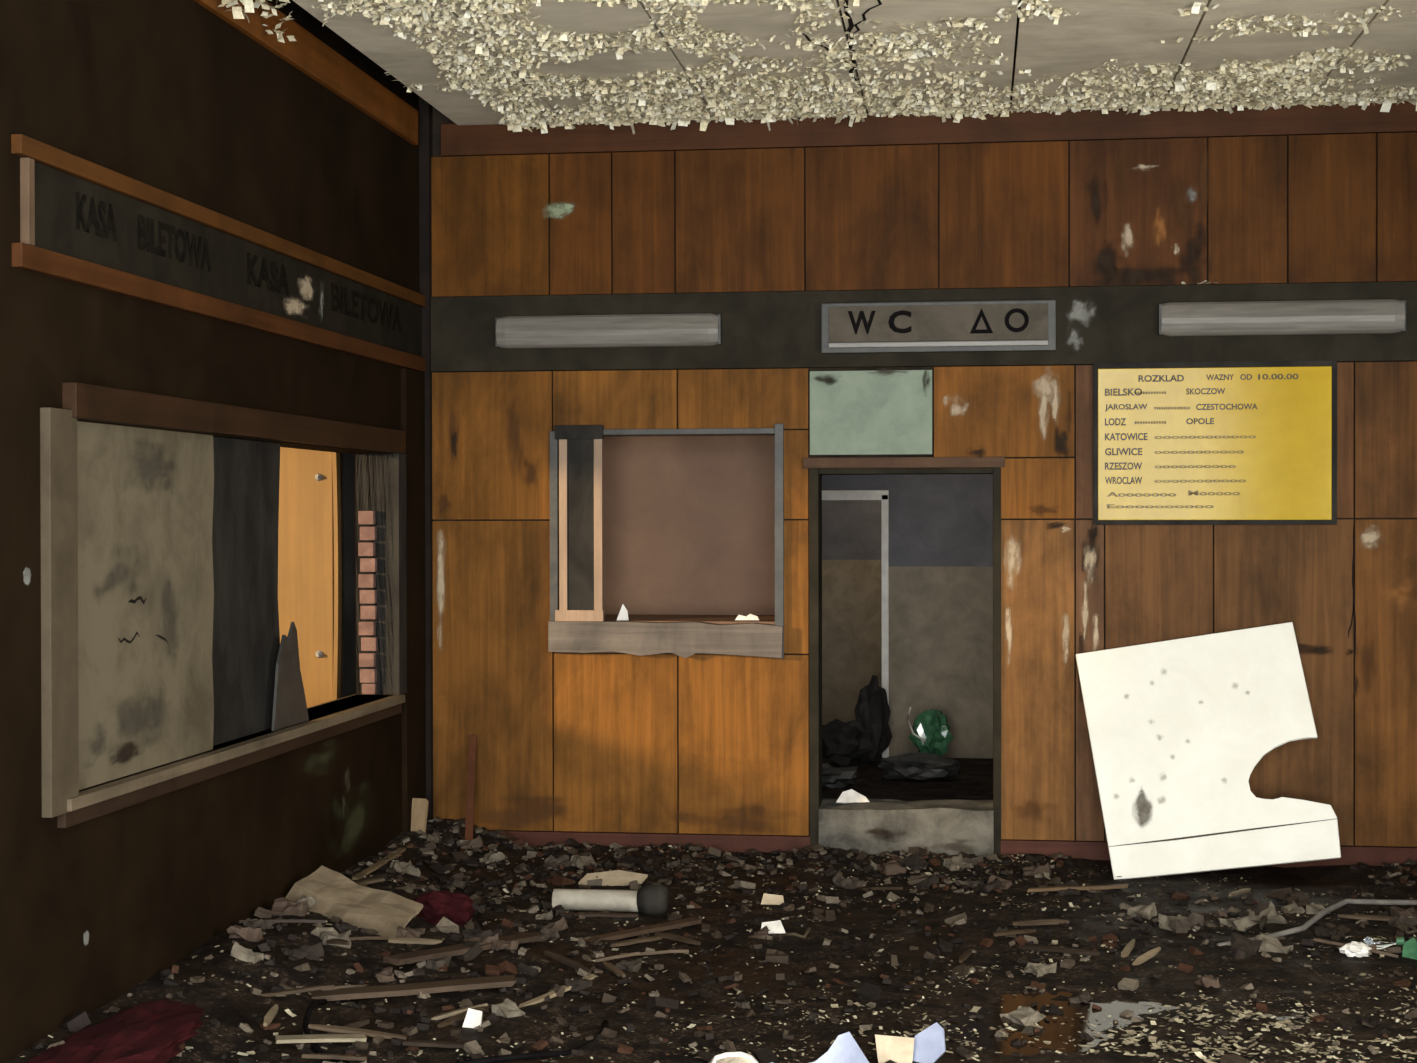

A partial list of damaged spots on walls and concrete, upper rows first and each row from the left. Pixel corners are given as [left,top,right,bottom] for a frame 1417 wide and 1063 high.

peeling [218,0,296,43]
crack [802,0,882,94]
peeling [312,0,1417,134]
peeling [287,280,323,314]
peeling [1008,541,1018,584]
peeling [1085,528,1097,566]
peeling [1063,584,1098,653]